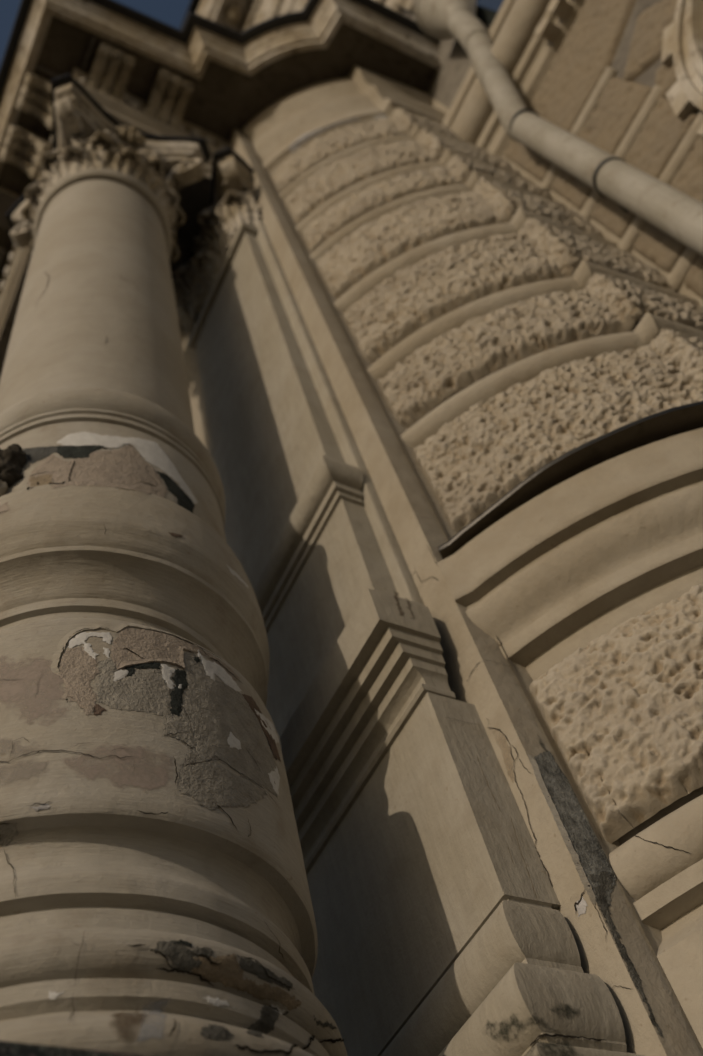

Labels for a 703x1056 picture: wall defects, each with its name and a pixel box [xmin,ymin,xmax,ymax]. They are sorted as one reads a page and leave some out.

peeling [23,432,198,513]
crack [0,737,135,773]
peeling [49,623,281,831]
crack [446,717,552,885]
peeling [528,743,663,1036]
spalling [128,939,344,1055]
water stain [487,1017,544,1041]